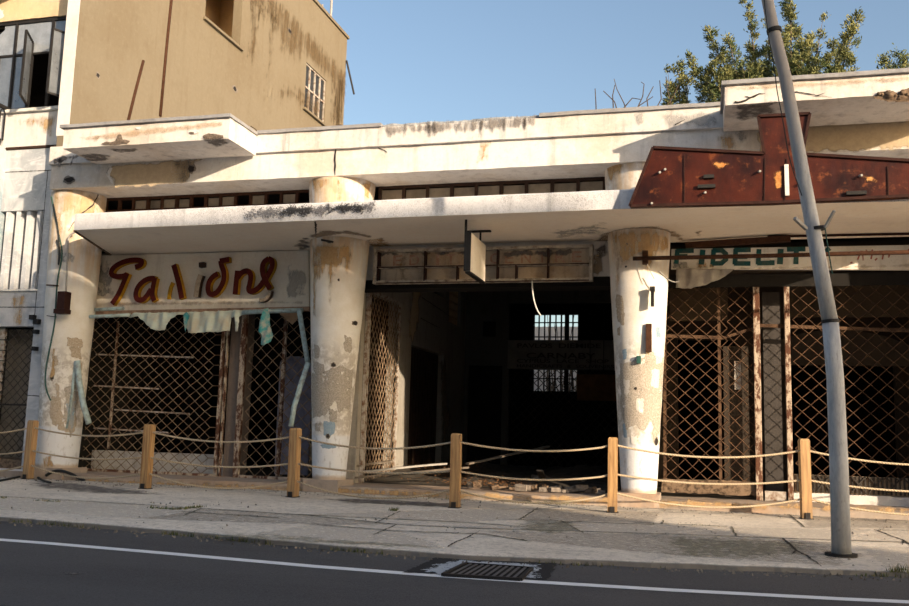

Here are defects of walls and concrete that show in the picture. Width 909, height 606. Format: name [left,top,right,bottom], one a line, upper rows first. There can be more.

leakage [252,0,345,125]
spalling [874,88,909,102]
leakage [386,117,535,136]
peeling [615,294,625,336]
peeling [67,337,83,371]
peeling [343,335,352,352]
peeling [49,383,79,437]
peeling [311,345,353,432]
peeling [620,350,664,446]